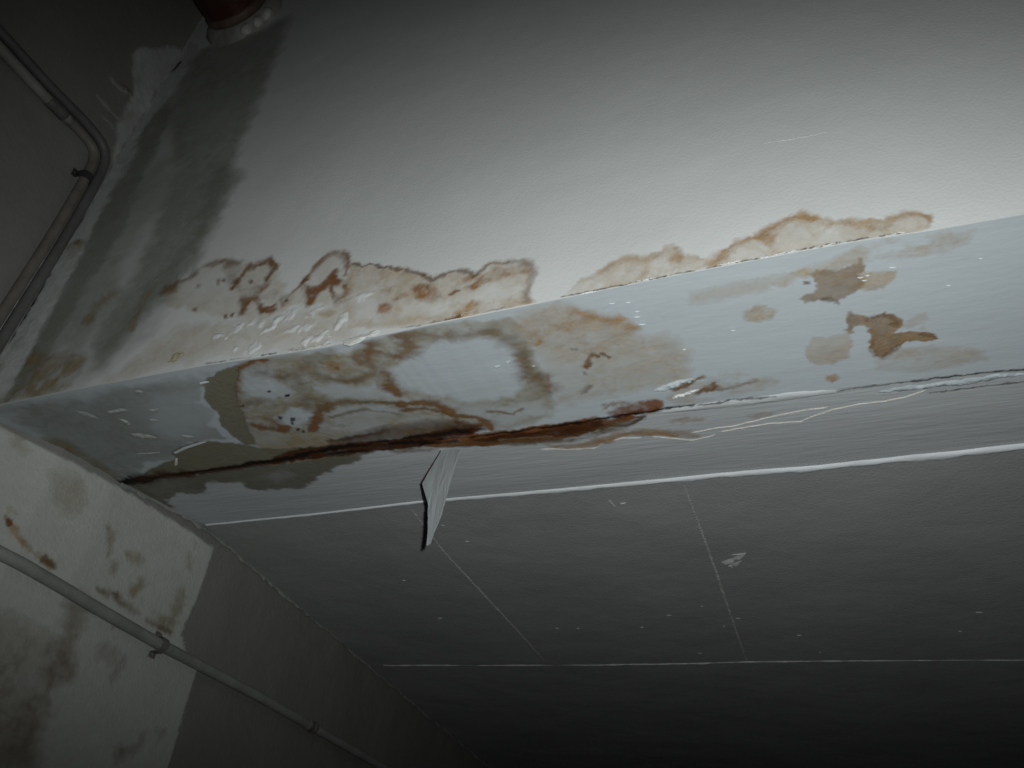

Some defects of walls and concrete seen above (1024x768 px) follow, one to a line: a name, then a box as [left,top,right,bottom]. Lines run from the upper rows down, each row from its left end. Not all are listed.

leakage [5,47,277,397]
leakage [299,253,399,305]
leakage [413,272,445,298]
leakage [806,266,864,291]
crack [878,369,1024,393]
crack [117,400,691,485]